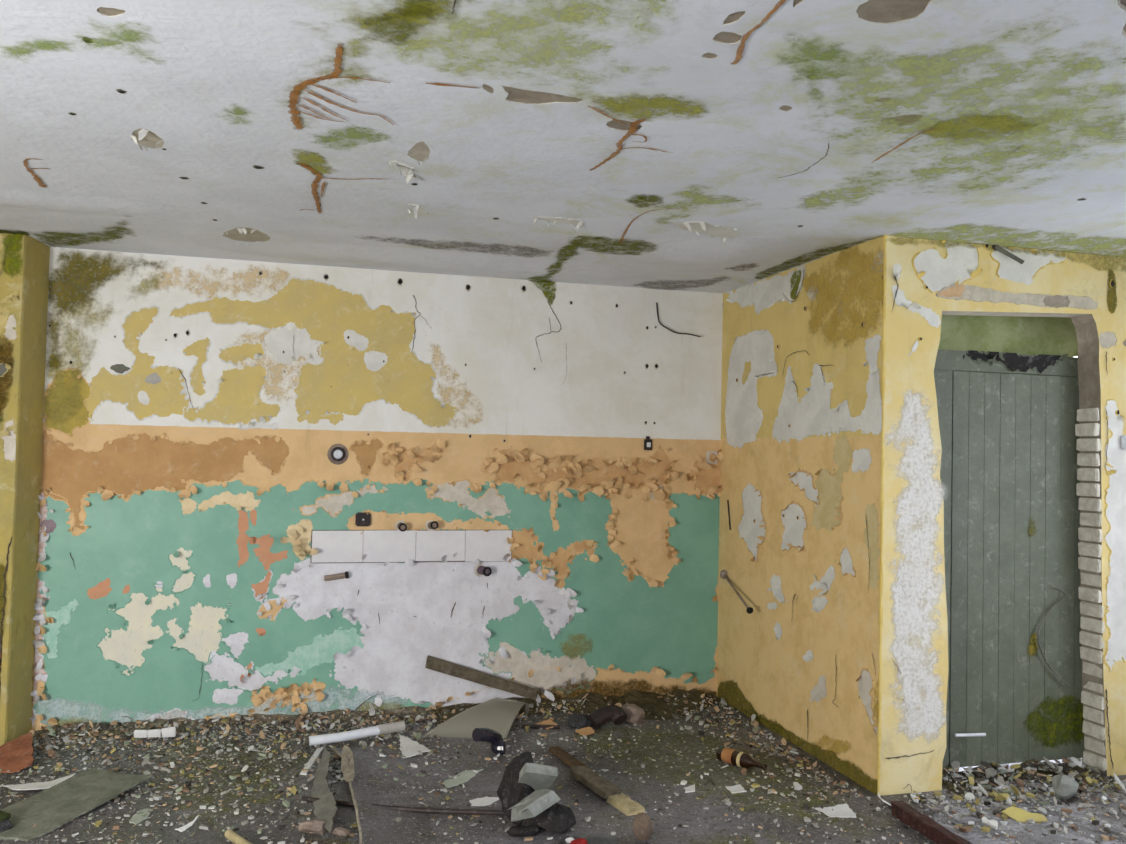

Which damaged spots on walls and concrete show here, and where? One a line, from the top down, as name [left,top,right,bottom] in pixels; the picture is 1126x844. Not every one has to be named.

spalling [702,11,745,59]
spalling [856,0,932,24]
rust [287,44,394,129]
rust [588,106,671,171]
rust [298,163,374,213]
peeling [726,266,819,314]
peeling [0,417,17,463]
peeling [30,277,946,741]
crack [0,537,12,639]
flaking render [399,734,431,758]
spalling [469,751,576,834]
flaking render [815,803,856,818]